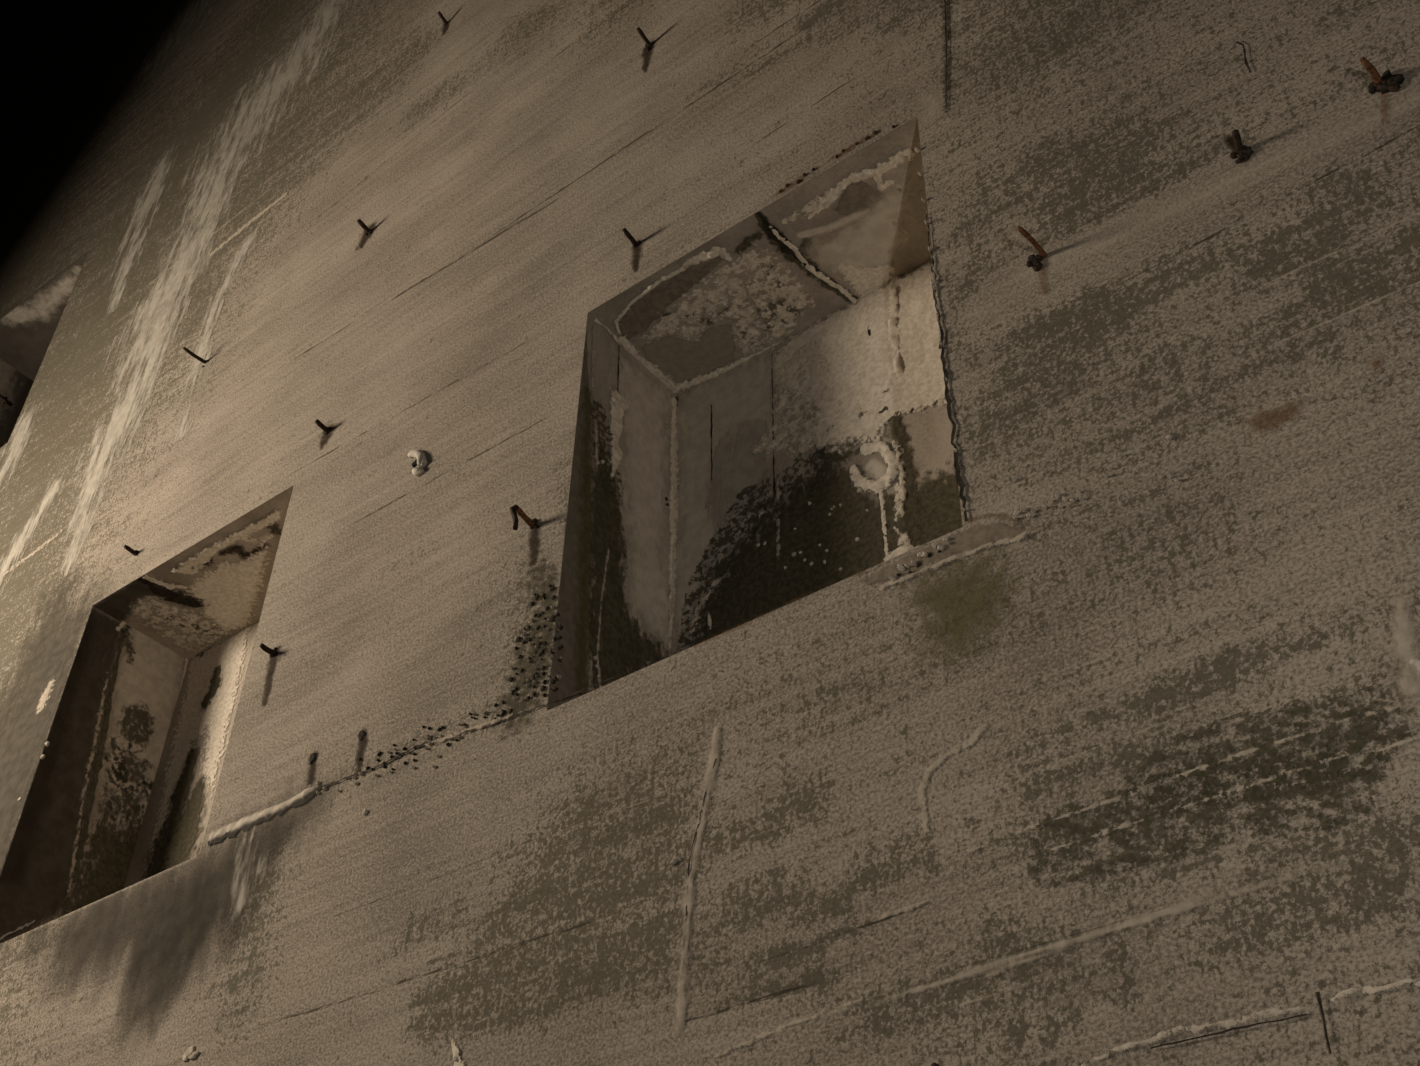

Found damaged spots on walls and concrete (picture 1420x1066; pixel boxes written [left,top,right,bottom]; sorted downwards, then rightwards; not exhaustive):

crack [939,0,953,113]
water stain [591,148,947,650]
water stain [593,550,610,688]
water stain [36,508,308,1026]
crack [1081,978,1420,1066]